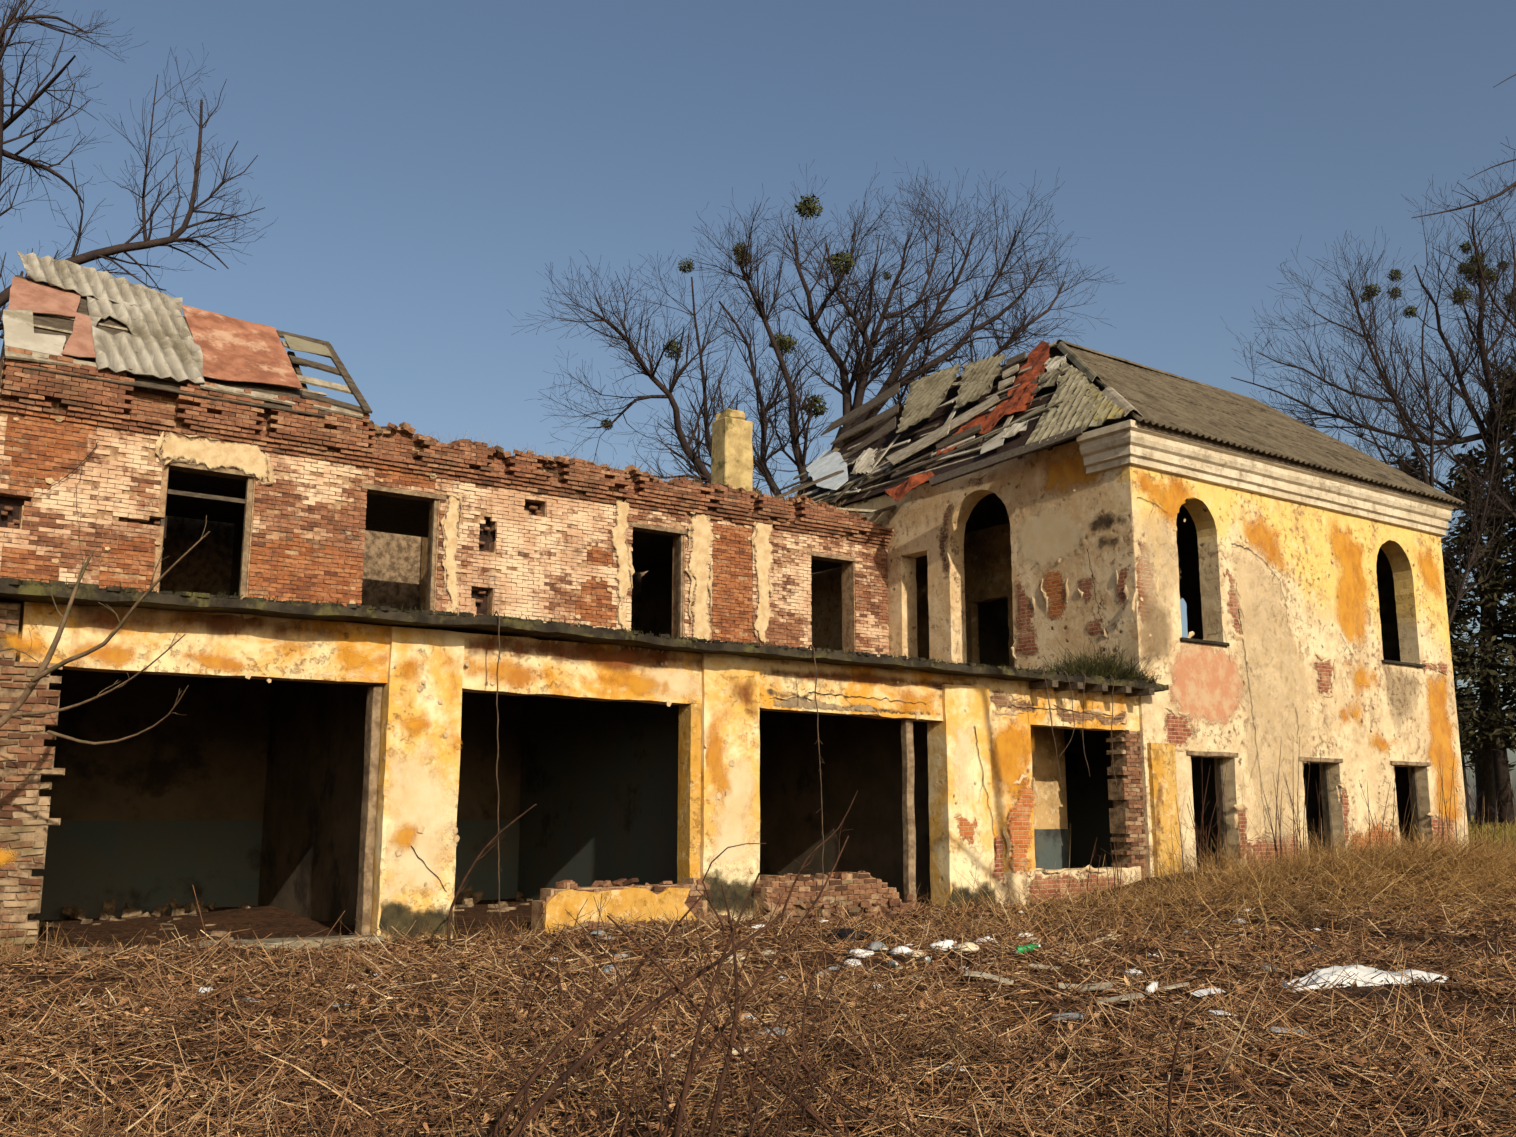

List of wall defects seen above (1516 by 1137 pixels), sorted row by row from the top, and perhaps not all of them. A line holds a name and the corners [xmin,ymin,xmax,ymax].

peeling [155,431,223,466]
leakage [87,610,332,635]
flaking render [1010,558,1096,660]
flaking render [1086,618,1107,638]
flaking render [1162,566,1245,752]
flaking render [1315,654,1392,751]
flaking render [954,794,980,845]
flaking render [989,690,1128,905]